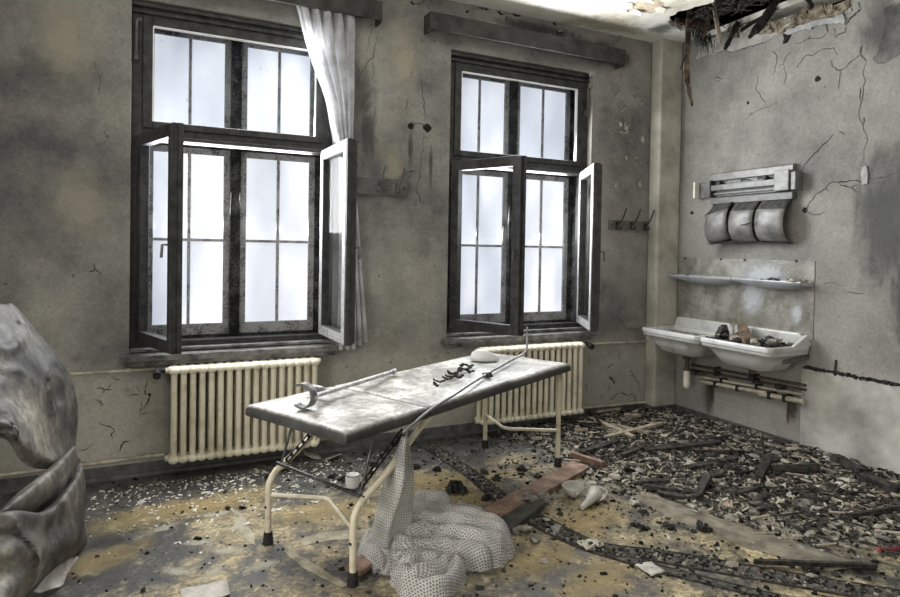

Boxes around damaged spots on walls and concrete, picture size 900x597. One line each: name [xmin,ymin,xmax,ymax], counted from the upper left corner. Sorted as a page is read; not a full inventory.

peeling [623,0,667,17]
flaking render [696,0,851,59]
crack [354,26,378,103]
crack [696,2,867,172]
crack [385,72,428,203]
crack [805,172,897,215]
crack [96,377,148,415]
crack [98,421,130,452]